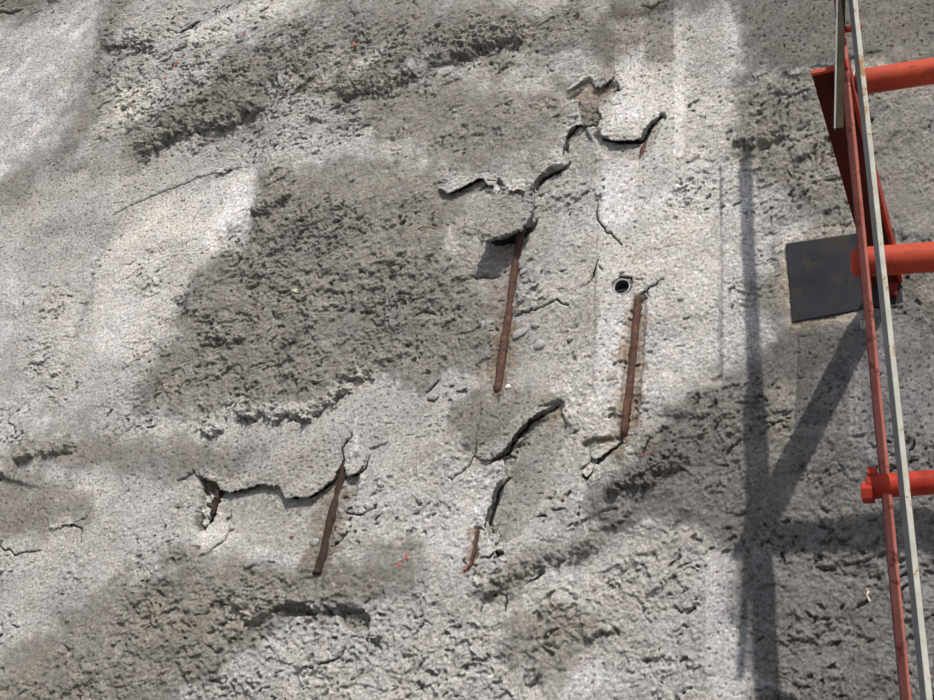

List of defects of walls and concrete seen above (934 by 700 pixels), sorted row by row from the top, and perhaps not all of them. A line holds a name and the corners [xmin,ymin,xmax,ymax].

spalling [439,75,661,270]
spalling [195,426,368,530]
crack [447,407,558,611]
spalling [466,406,565,586]
spalling [581,297,649,488]